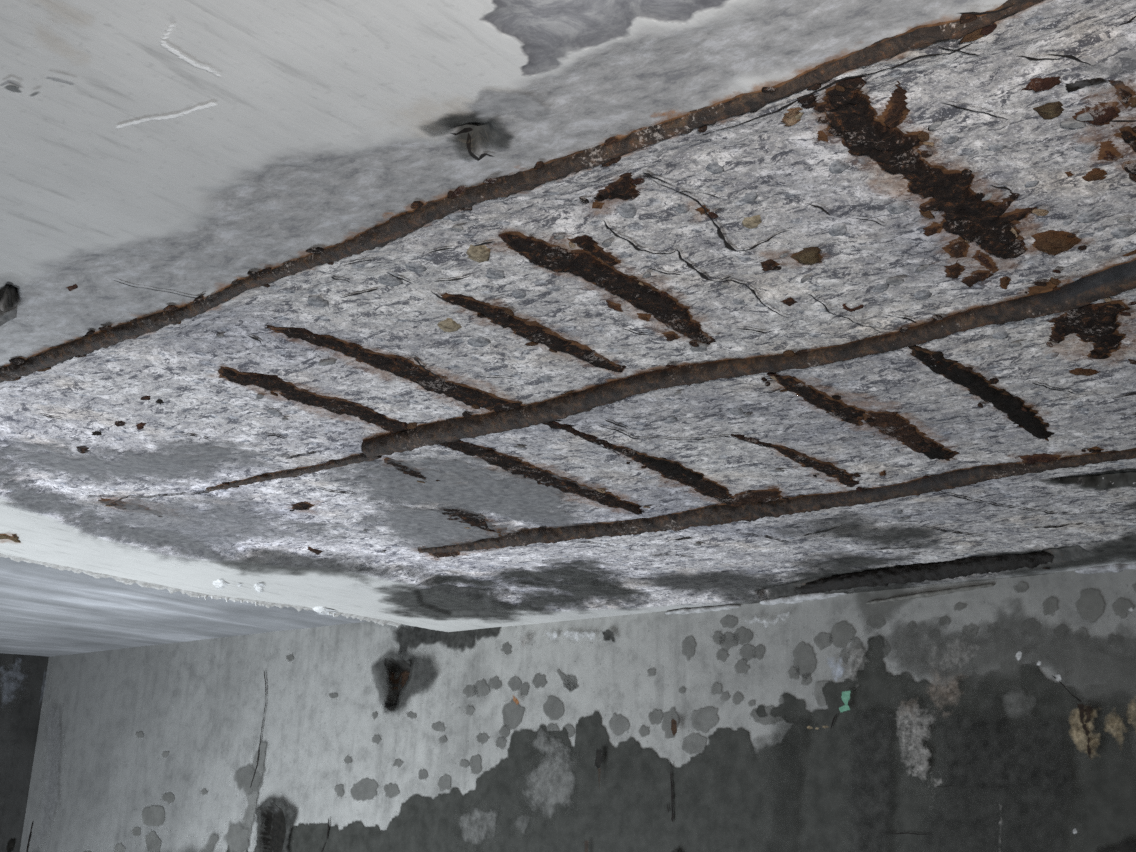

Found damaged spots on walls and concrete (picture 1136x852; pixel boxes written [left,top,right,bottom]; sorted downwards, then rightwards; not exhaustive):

rust [781,76,1087,289]
rust [217,366,424,436]
rust [264,325,525,418]
rust [441,293,627,381]
rust [440,440,650,515]
spalling [0,0,1136,613]
rust [498,231,716,347]
rust [542,420,804,507]
crack [604,172,788,318]
rust [761,372,960,461]
rust [908,345,1115,464]
leakage [0,439,1136,852]